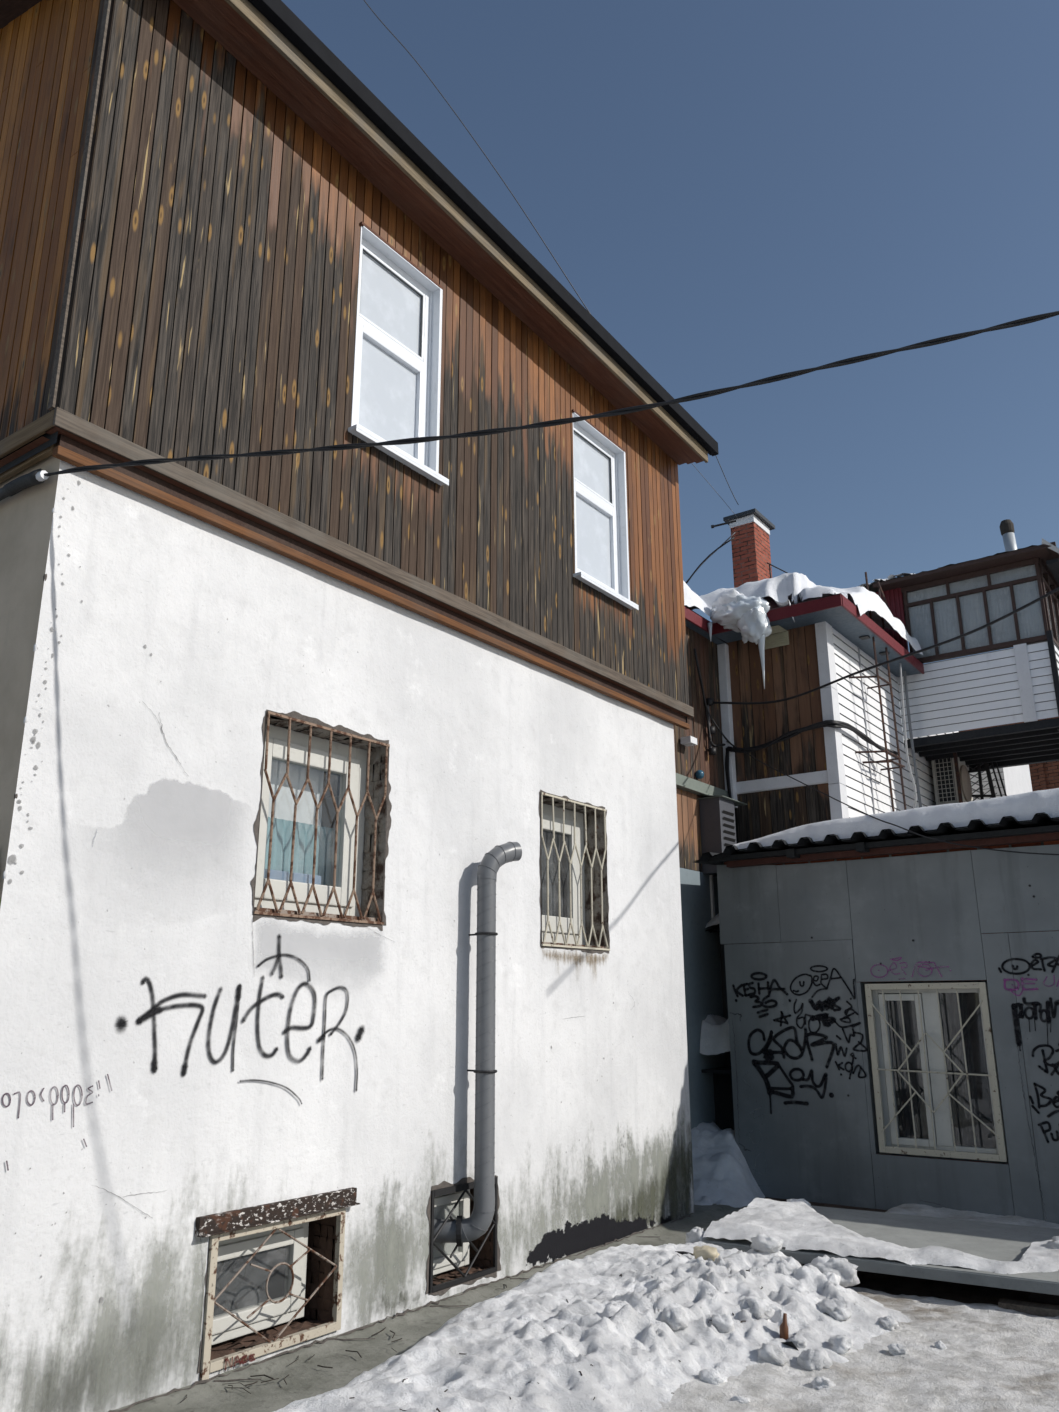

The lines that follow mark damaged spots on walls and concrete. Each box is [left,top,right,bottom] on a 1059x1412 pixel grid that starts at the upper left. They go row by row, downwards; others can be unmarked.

water stain [24,1247,206,1412]
water stain [349,1205,430,1326]
water stain [497,1121,693,1276]
spalling [527,1213,672,1266]